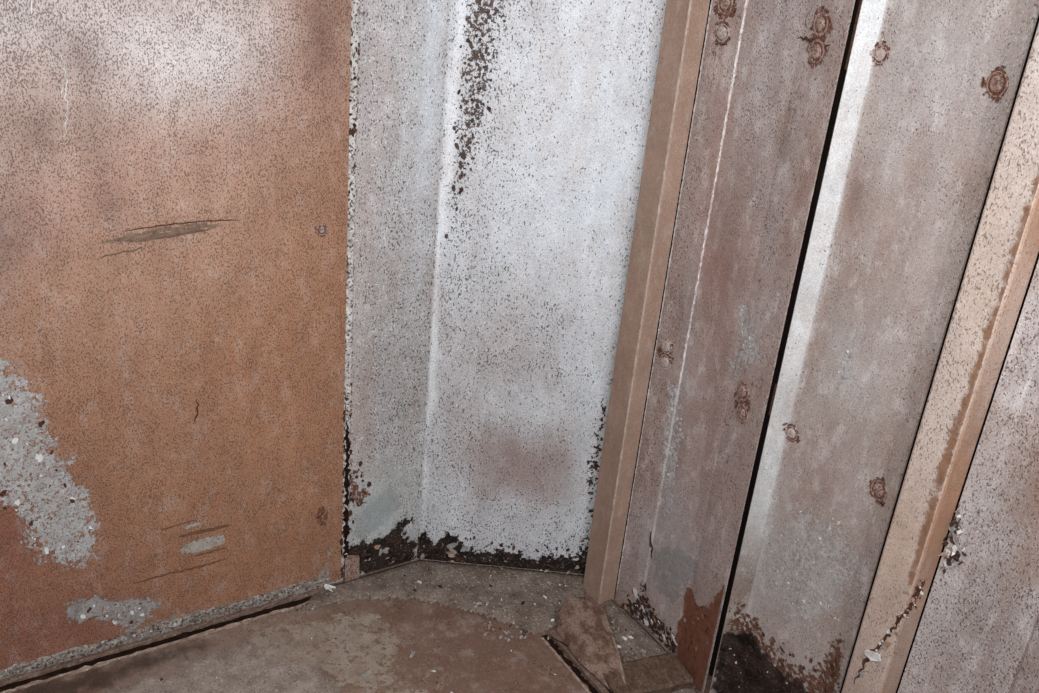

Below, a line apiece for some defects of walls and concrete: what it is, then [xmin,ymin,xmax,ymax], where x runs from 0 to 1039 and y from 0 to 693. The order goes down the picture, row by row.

rust [713,0,737,46]
rust [797,6,833,69]
rust [981,65,1008,102]
rust [909,175,1039,585]
peeling [0,357,104,571]
leakage [161,520,231,537]
leakage [348,514,588,574]
peeling [64,594,161,634]
leakage [0,547,343,680]
leakage [712,631,807,693]
rust [675,585,845,693]